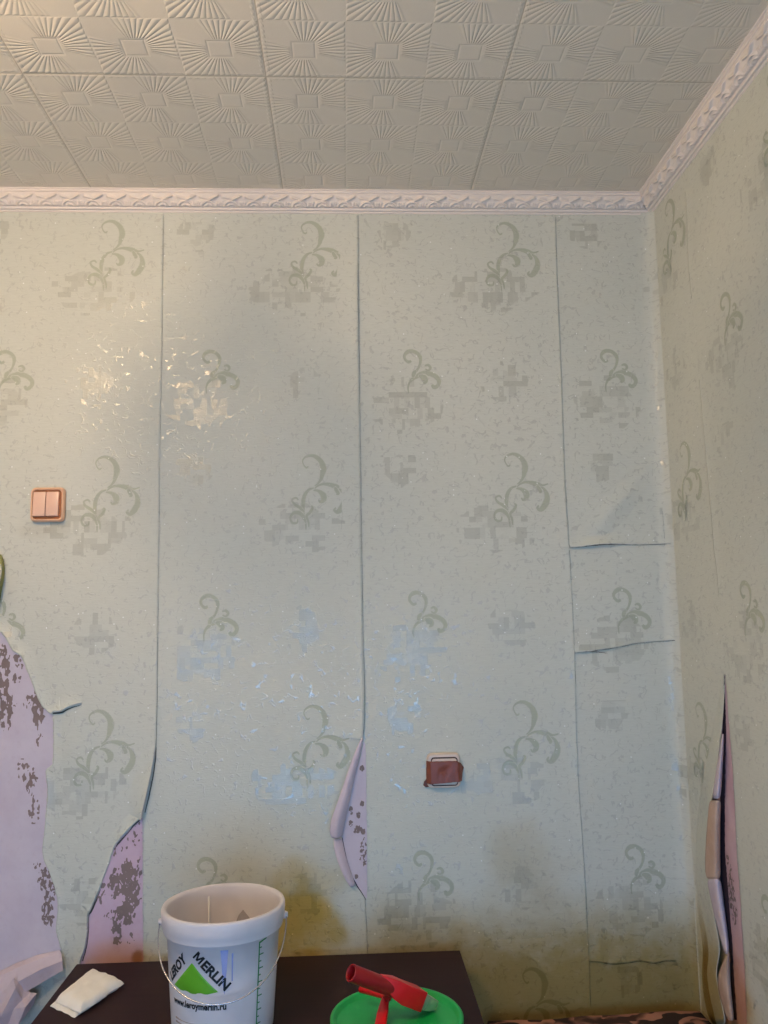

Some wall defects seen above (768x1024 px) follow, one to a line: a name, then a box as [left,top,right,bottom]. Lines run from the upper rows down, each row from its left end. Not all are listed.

peeling [0,644,45,747]
peeling [17,758,40,824]
peeling [33,862,55,927]
flaking render [80,818,144,964]
flaking render [342,741,367,899]
flaking render [714,676,747,1024]